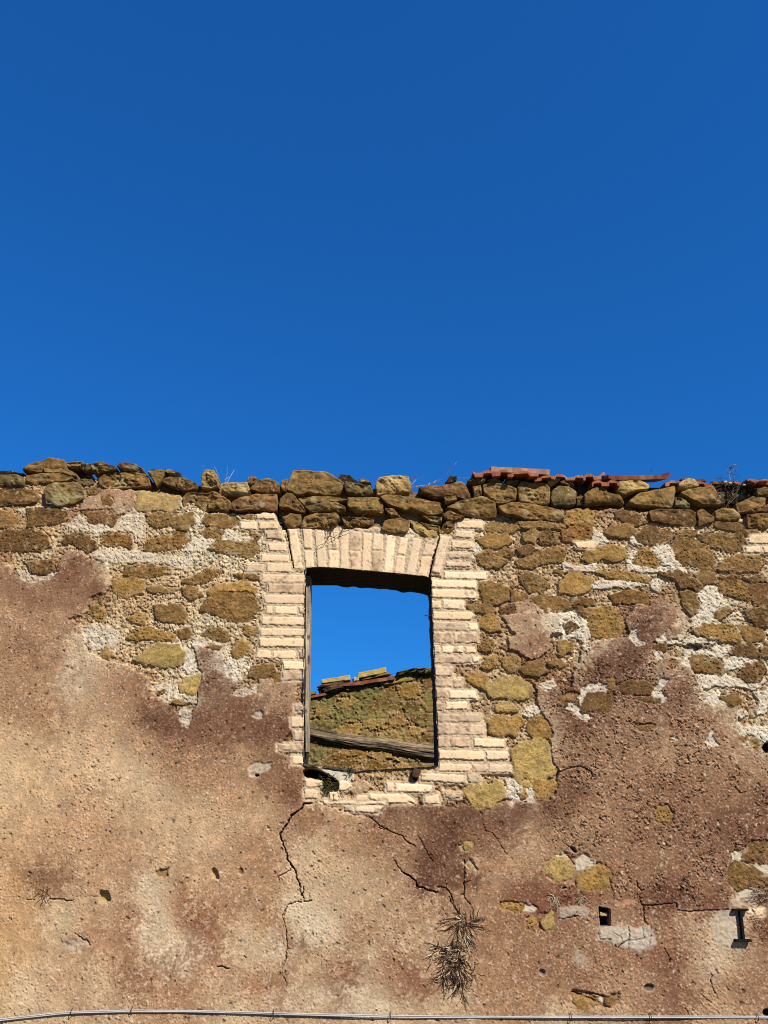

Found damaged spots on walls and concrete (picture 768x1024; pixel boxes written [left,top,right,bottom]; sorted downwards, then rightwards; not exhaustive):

peeling [0,476,768,819]
crack [278,802,313,988]
crack [370,803,471,912]
flaking render [499,901,590,930]
flaking render [544,852,614,891]